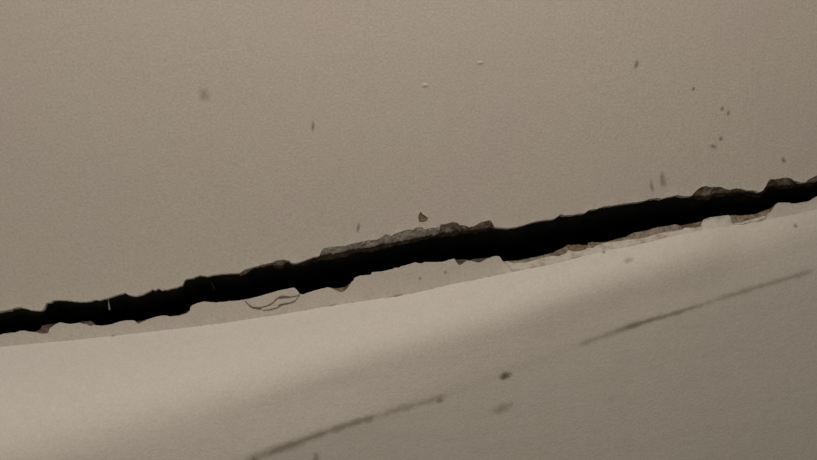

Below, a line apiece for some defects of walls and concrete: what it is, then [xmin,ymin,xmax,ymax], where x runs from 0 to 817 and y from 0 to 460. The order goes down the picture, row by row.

crack [0,176,817,344]